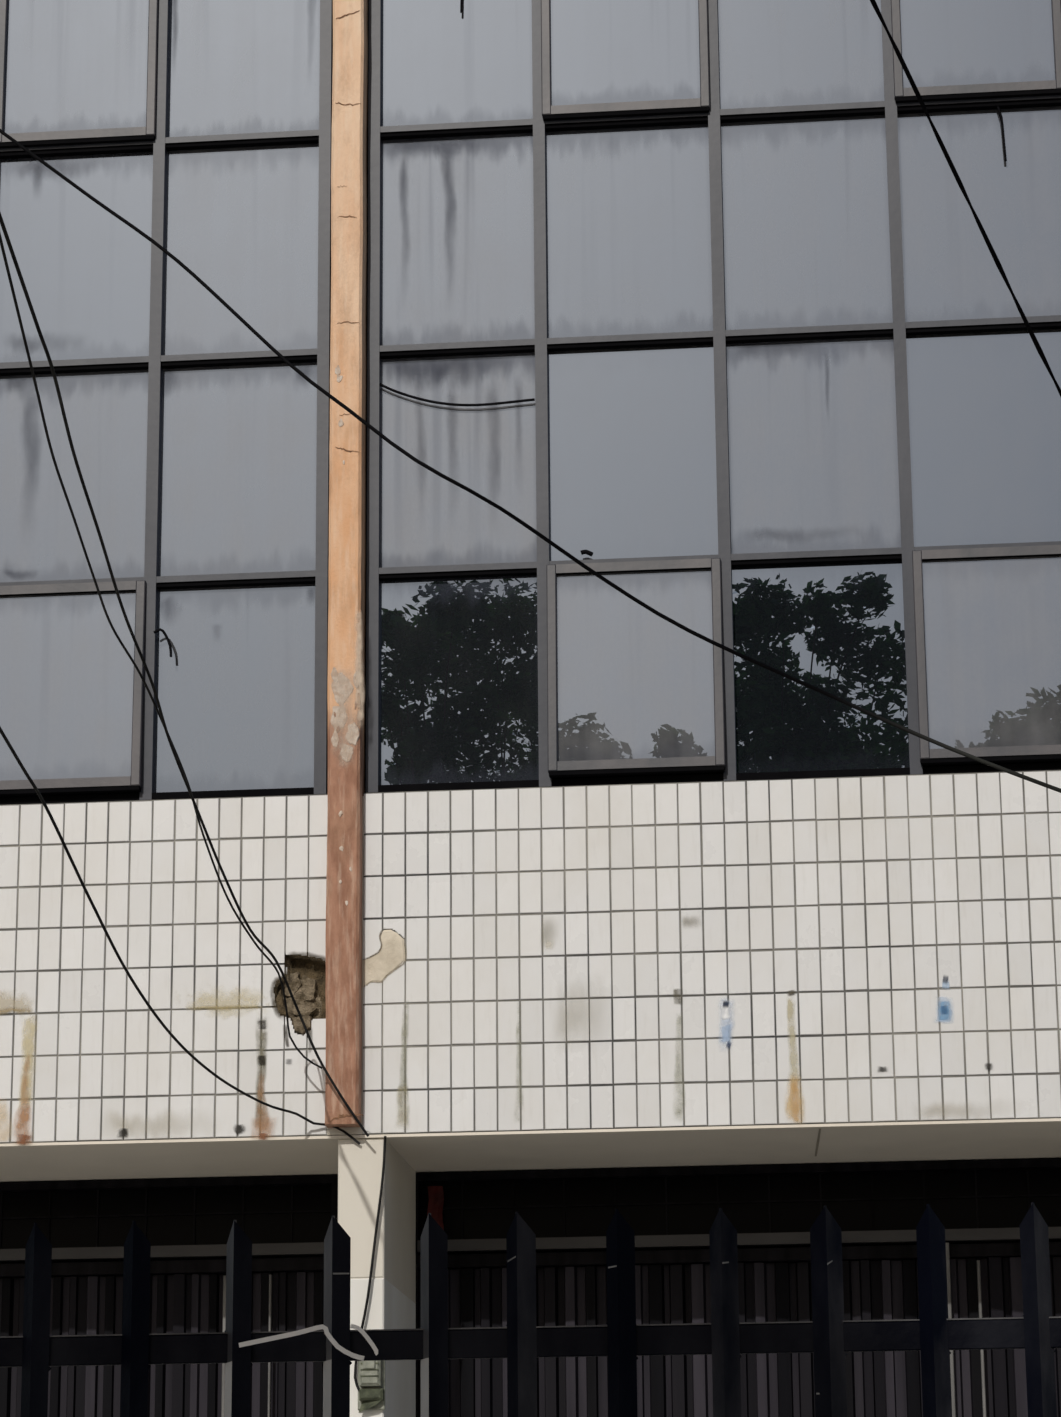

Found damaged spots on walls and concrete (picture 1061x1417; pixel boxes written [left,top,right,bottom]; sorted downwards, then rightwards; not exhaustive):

peeling [330,623,363,762]
rust [17,1020,35,1144]
rust [257,1032,266,1140]
spalling [273,954,326,1038]
peeling [362,930,406,988]
rust [787,990,800,1118]